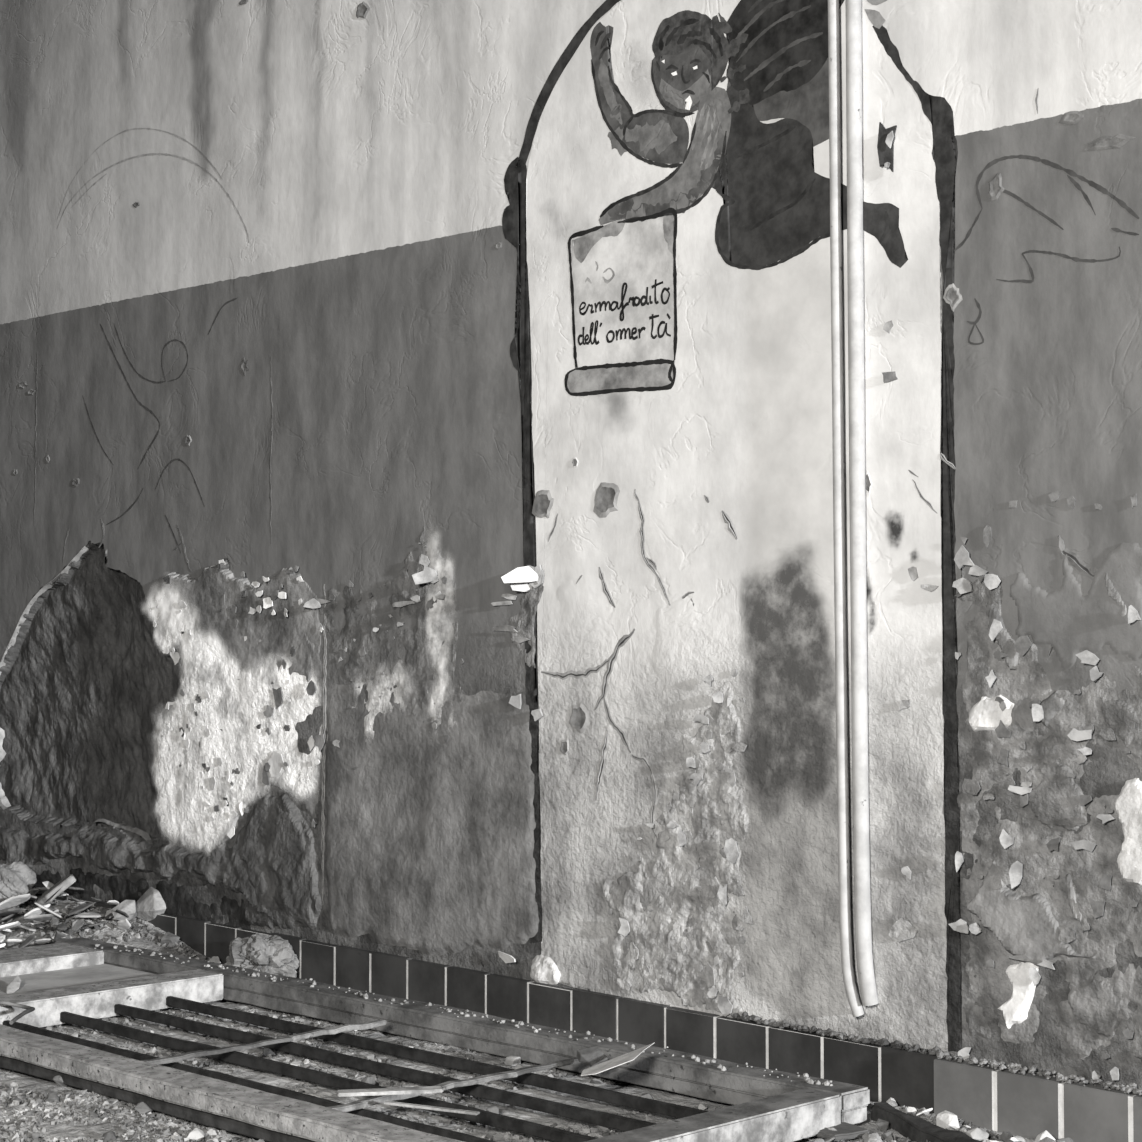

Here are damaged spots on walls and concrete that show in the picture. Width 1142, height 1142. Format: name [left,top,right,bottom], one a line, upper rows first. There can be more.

spalling [0,526,464,930]
peeling [491,565,544,668]
peeling [509,694,543,721]
crack [548,513,558,542]
crack [576,567,615,608]
crack [541,629,657,840]
flaking render [602,669,753,1018]
flaking render [908,536,1142,1080]